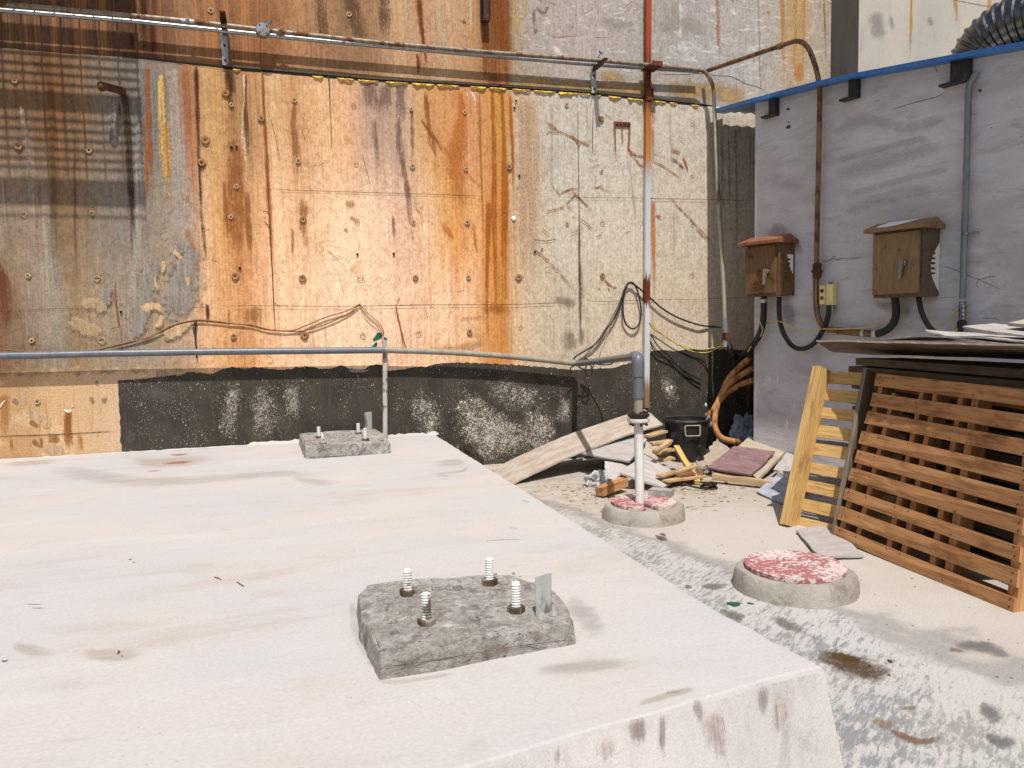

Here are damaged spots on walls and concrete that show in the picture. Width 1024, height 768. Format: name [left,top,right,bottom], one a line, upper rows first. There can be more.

rust [223,139,252,257]
rust [261,72,272,242]
rust [397,92,467,201]
rust [467,90,514,324]